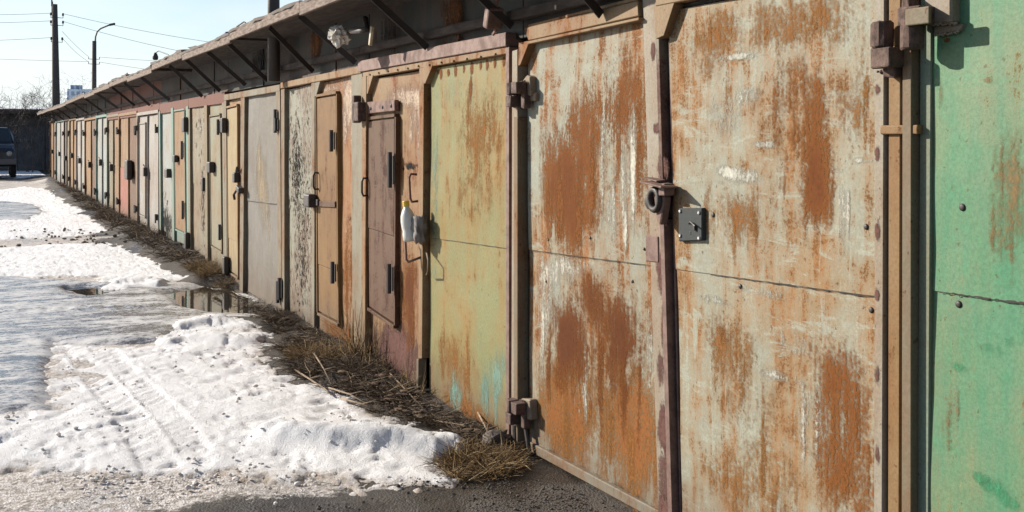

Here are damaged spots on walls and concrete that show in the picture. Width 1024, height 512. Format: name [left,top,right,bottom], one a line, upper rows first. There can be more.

corrosion [693,0,853,78]
corrosion [437,57,505,218]
corrosion [540,45,650,257]
corrosion [761,57,880,239]
corrosion [372,254,418,377]
corrosion [440,334,493,429]
corrosion [537,270,658,512]
corrosion [705,316,753,412]
corrosion [704,386,798,512]
corrosion [800,337,880,512]